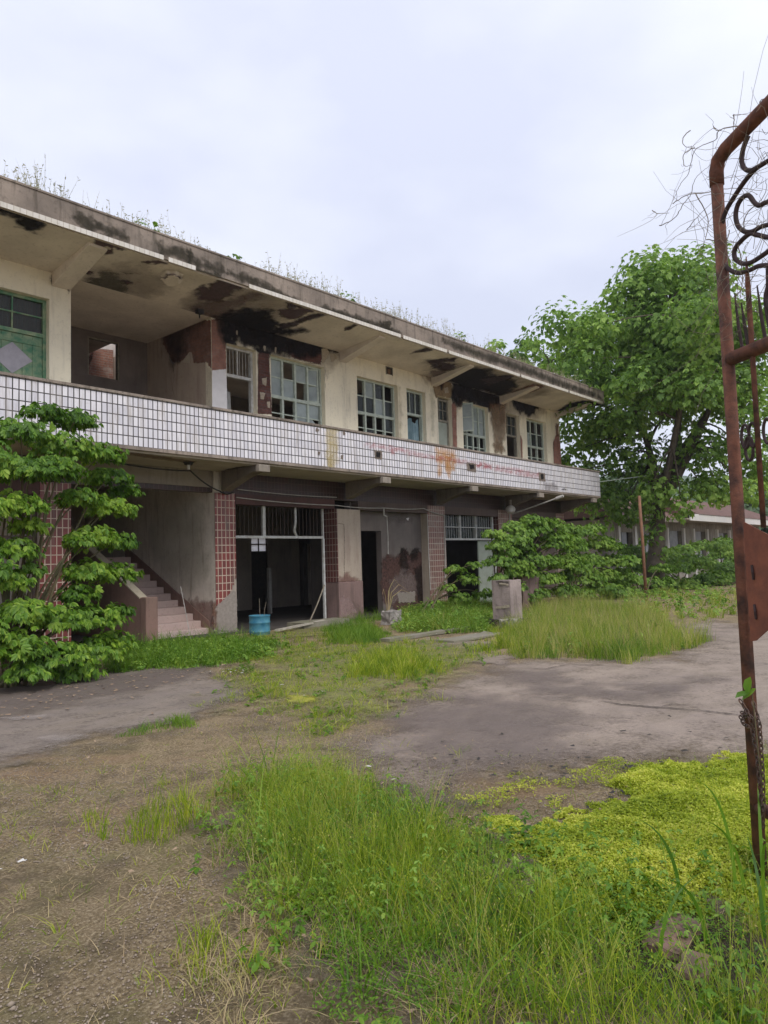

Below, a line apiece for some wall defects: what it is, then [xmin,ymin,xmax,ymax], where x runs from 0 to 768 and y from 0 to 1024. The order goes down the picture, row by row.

damp [0,209,45,231]
damp [87,272,128,293]
flaking render [163,280,262,370]
damp [443,339,601,411]